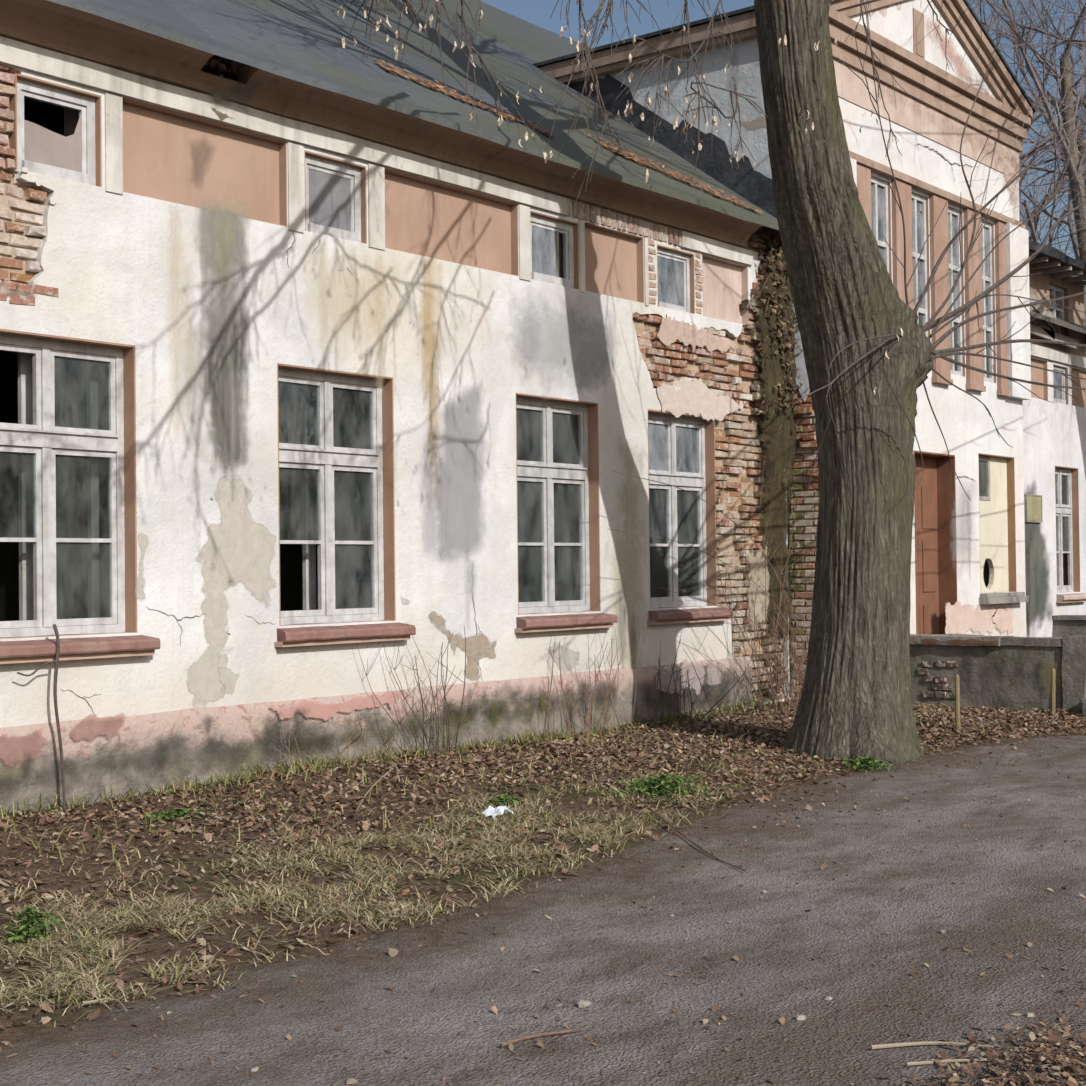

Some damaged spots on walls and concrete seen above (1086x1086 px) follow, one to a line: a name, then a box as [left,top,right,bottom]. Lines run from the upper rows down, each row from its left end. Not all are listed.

flaking render [0,64,59,306]
water stain [204,206,246,469]
water stain [525,318,611,377]
water stain [428,392,481,553]
flaking render [633,226,819,703]
crack [147,607,206,644]
peeling [187,477,276,704]
peeling [429,612,496,680]
peeling [945,601,1014,635]
water stain [1024,487,1050,636]
peeling [71,714,125,741]
water stain [261,724,331,755]